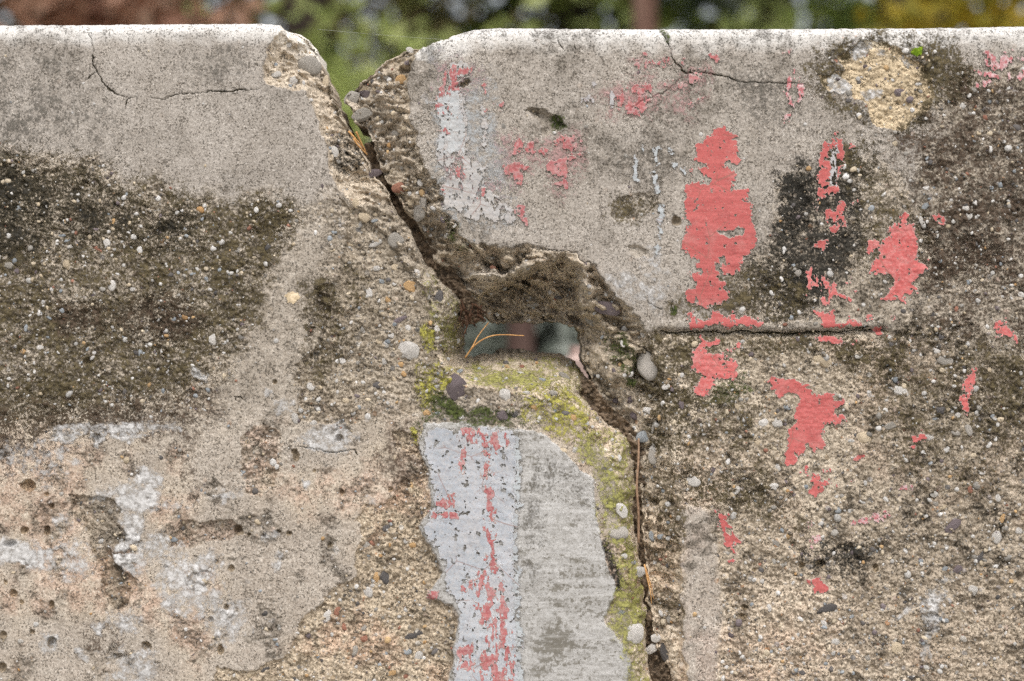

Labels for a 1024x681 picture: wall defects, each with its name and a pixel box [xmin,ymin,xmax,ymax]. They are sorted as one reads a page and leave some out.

crack [87,33,130,105]
crack [169,89,252,97]
crack [647,34,787,99]
spalling [818,40,935,132]
crack [364,141,484,324]
peeling [813,239,829,251]
leakage [0,140,304,475]
spalling [262,25,689,681]
crack [653,304,872,335]
leakage [602,30,1024,642]
crack [580,372,673,681]